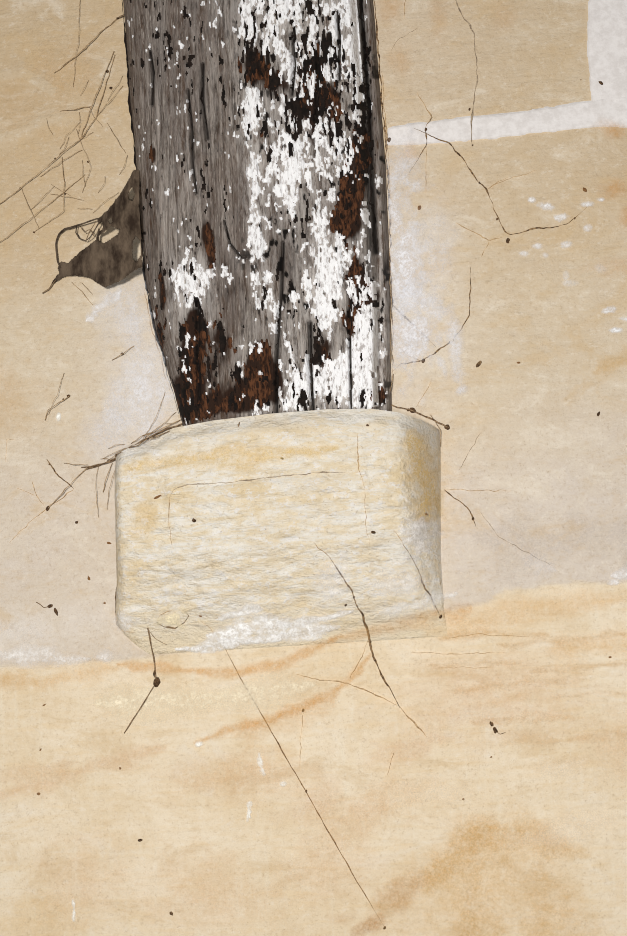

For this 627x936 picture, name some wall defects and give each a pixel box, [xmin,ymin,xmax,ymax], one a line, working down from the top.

crack [122,2,155,170]
crack [139,208,179,414]
peeling [170,246,234,308]
crack [308,324,316,408]
peeling [237,0,440,412]
crack [291,0,587,385]
crack [297,545,427,737]
crack [203,623,386,929]